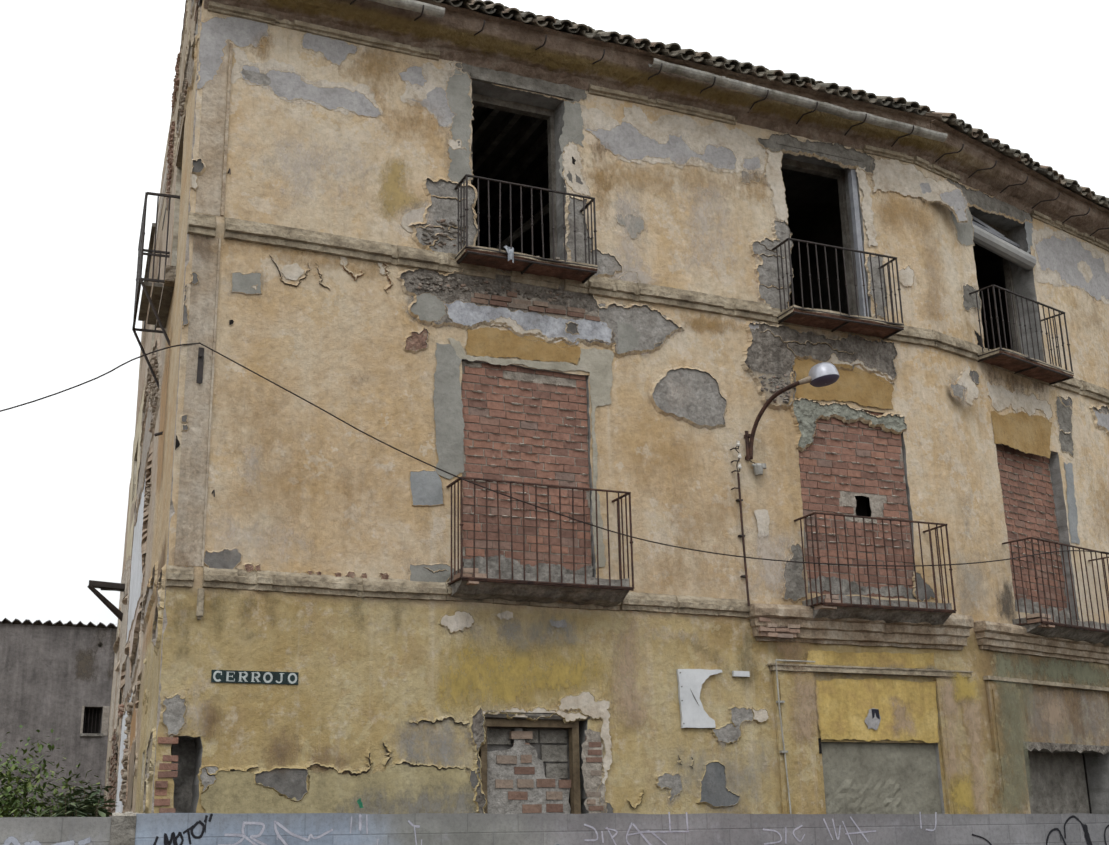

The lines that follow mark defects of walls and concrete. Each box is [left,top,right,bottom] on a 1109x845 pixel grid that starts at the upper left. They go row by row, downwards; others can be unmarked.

peeling [154,0,383,250]
flaking render [396,61,684,365]
peeling [519,89,1109,319]
flaking render [648,366,727,430]
flaking render [740,320,907,452]
peeling [948,366,1080,545]
flaking render [1089,403,1109,436]
flaking render [103,336,189,816]
peeling [438,610,475,634]
peeling [198,690,614,814]
flaking render [627,755,740,809]
peeling [710,706,769,745]